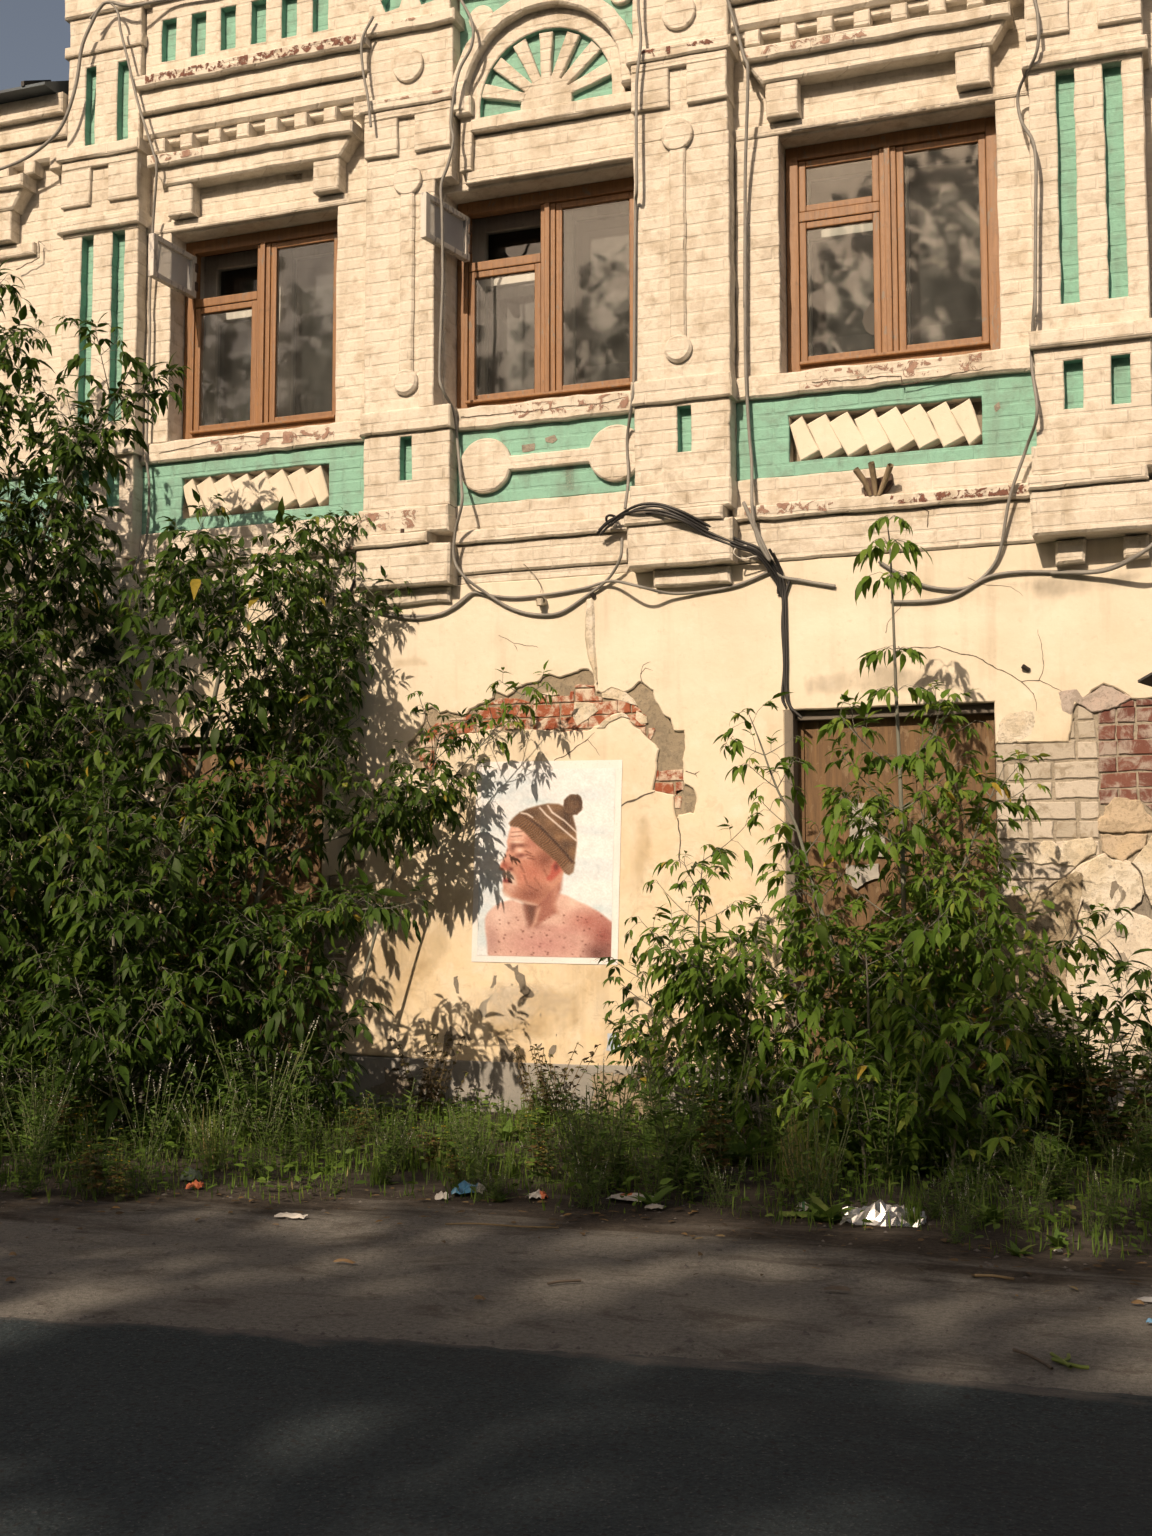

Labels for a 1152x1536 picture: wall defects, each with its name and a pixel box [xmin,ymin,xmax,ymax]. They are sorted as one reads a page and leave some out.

crack [885,588,1062,711]
spalling [408,670,696,817]
spalling [996,684,1152,1044]